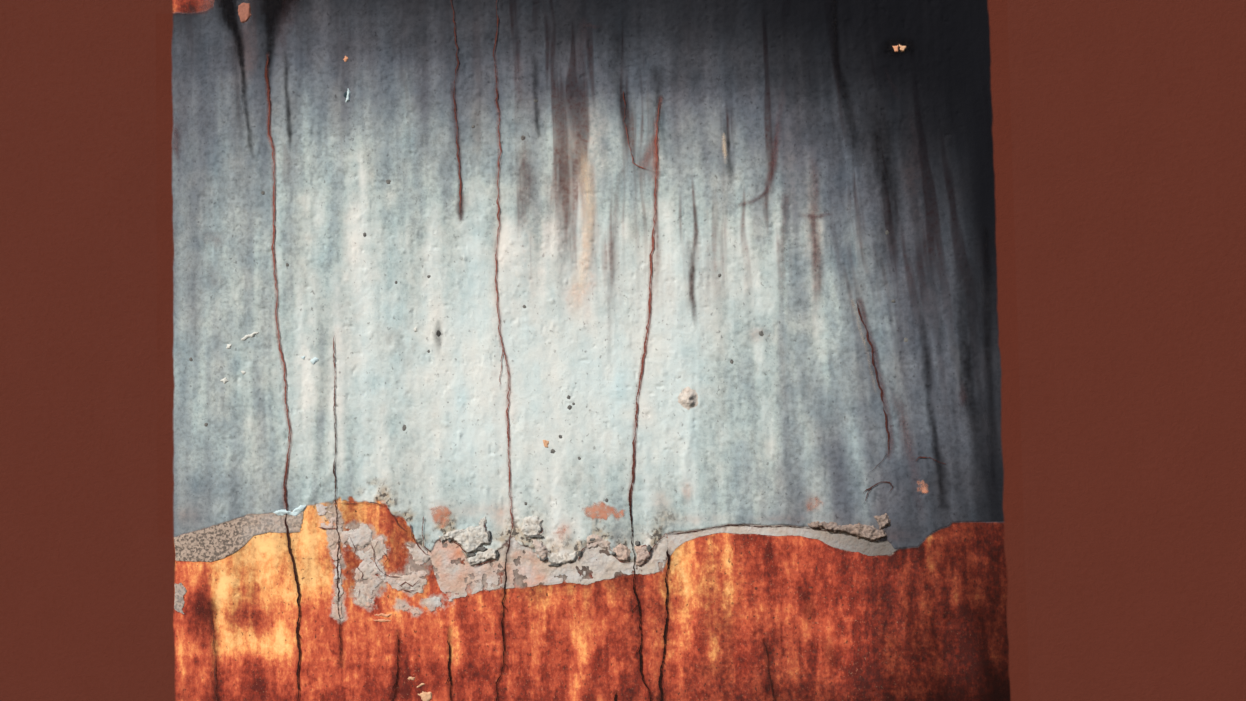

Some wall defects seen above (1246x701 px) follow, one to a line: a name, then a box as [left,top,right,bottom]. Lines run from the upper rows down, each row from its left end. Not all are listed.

corrosion [173,0,215,15]
crack [451,2,462,217]
crack [265,55,301,698]
crack [333,338,342,660]
crack [445,631,453,699]
crack [493,0,513,701]
peeling [174,498,897,622]
corrosion [173,497,1011,701]
crack [614,91,826,701]